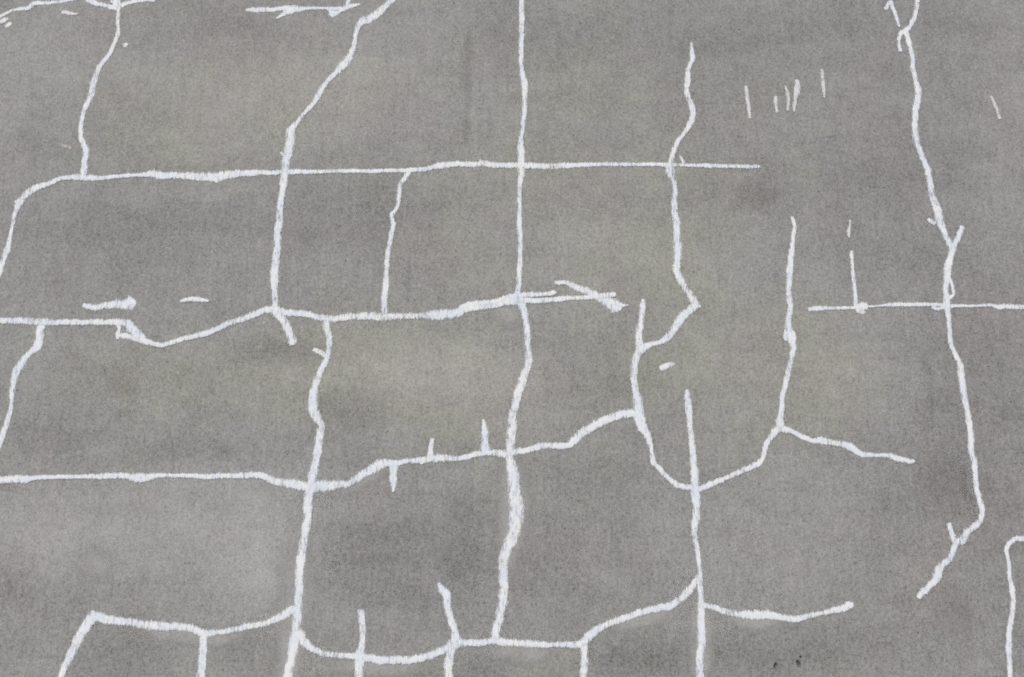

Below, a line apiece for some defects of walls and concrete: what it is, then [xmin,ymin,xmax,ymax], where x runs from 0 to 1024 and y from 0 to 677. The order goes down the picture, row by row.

crack [0,0,760,450]
crack [0,216,915,677]
crack [808,0,1024,599]
crack [1004,536,1024,677]